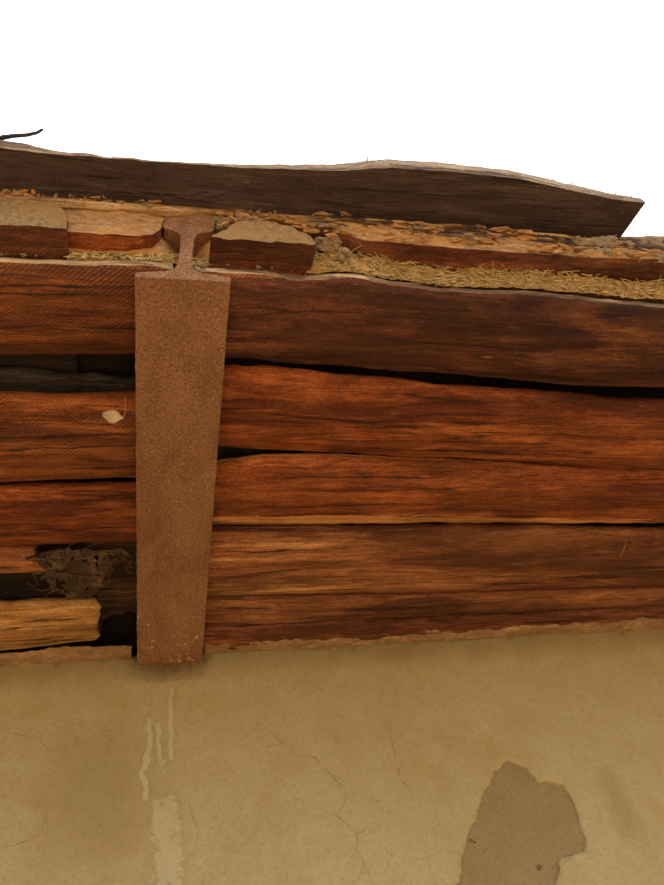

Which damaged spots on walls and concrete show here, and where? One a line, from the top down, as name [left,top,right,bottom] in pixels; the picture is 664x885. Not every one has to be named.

water stain [138,686,191,885]
peeling [457,762,585,885]